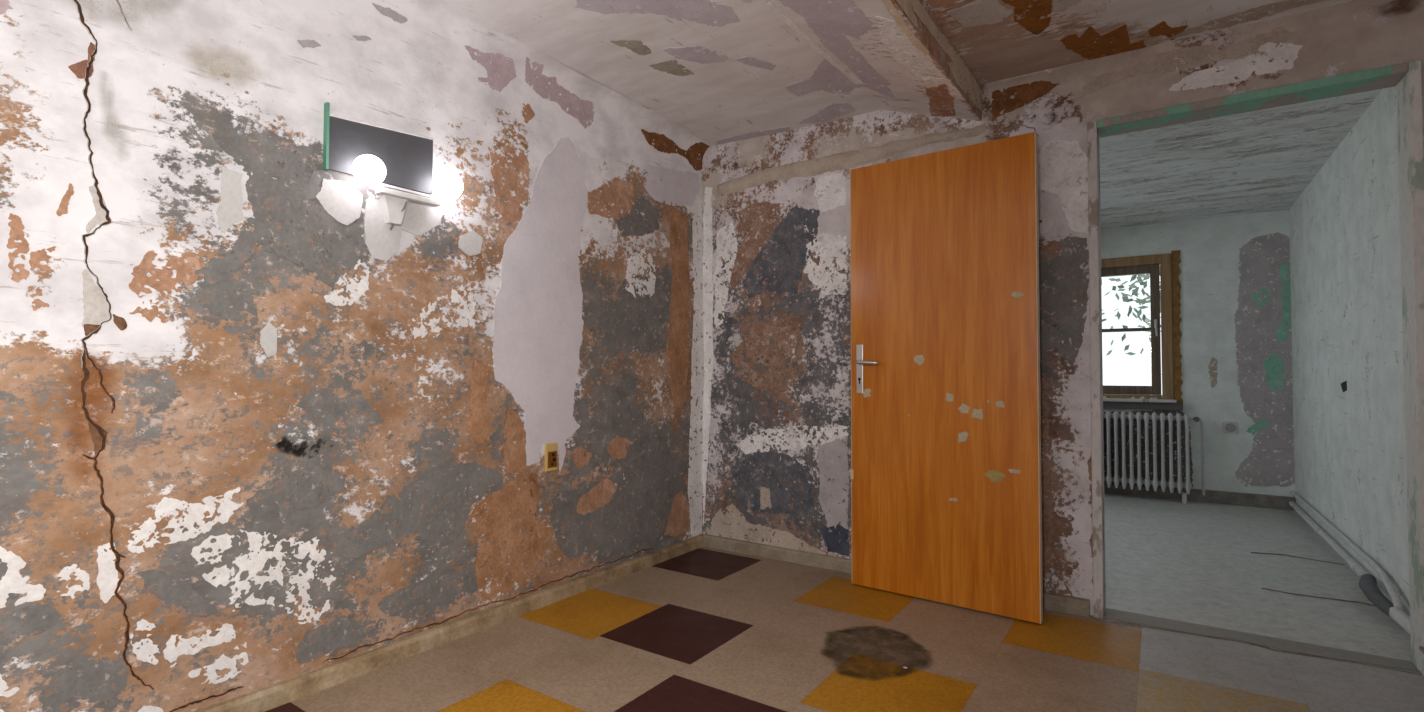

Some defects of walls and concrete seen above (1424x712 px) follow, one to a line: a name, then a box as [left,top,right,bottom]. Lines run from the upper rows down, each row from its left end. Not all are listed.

flaking render [68,42,95,79]
peeling [465,45,594,129]
peeling [1060,0,1325,60]
peeling [6,213,56,311]
crack [73,0,244,712]
peeling [82,123,371,336]
peeling [412,288,488,339]
peeling [571,0,1060,558]
peeling [1038,140,1089,366]
peeling [1234,232,1295,487]
peeling [0,409,551,712]
leakage [824,627,928,679]